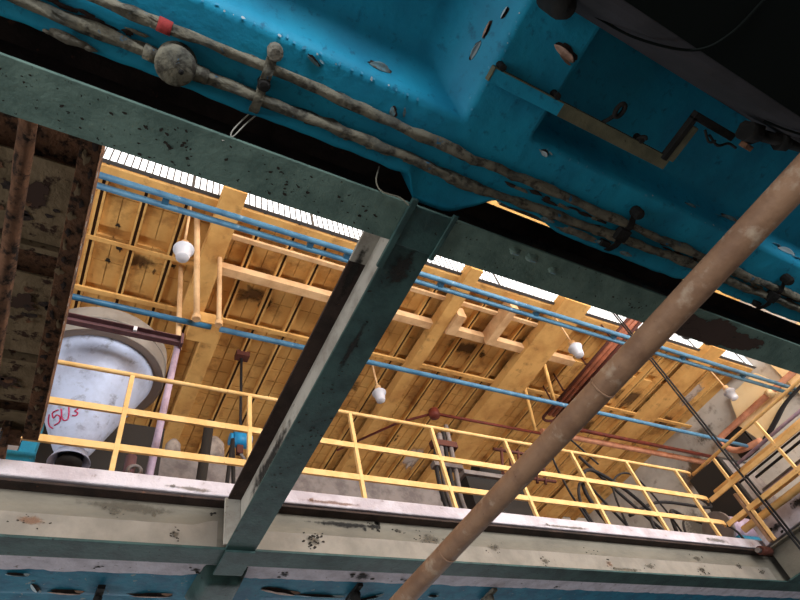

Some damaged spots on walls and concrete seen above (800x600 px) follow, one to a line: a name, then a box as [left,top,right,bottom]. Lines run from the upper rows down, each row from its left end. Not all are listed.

peeling [469,7,509,60]
peeling [278,34,324,67]
peeling [350,60,392,81]
peeling [554,42,578,66]
rust [10,143,99,430]
peeling [5,573,85,595]